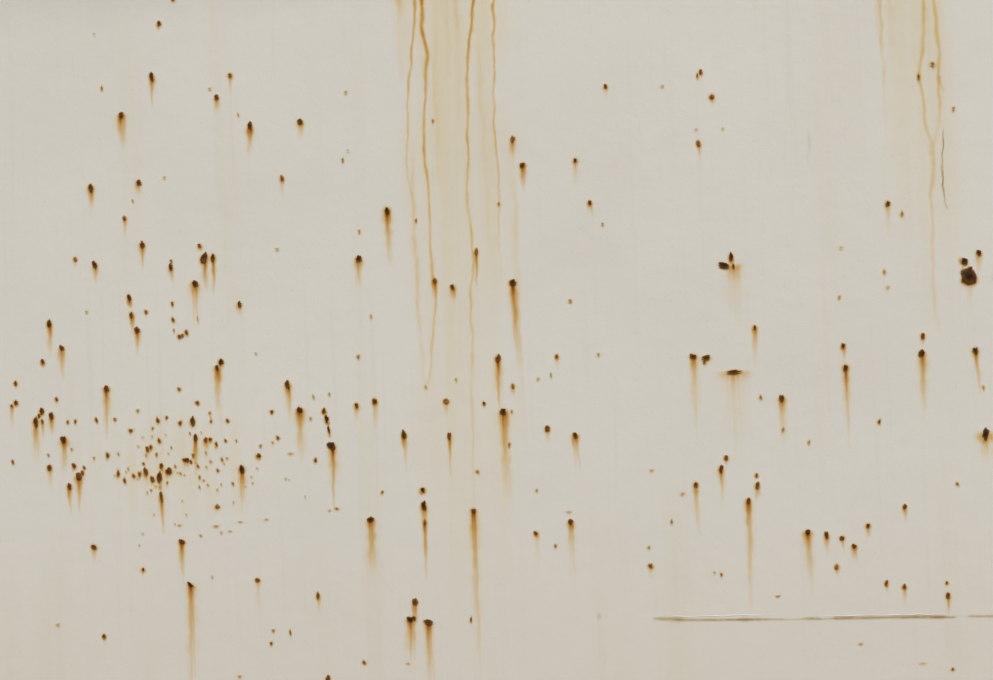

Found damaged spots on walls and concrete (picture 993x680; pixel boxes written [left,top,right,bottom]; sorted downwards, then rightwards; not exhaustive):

rust [961,250,982,284]
rust [117,416,237,501]